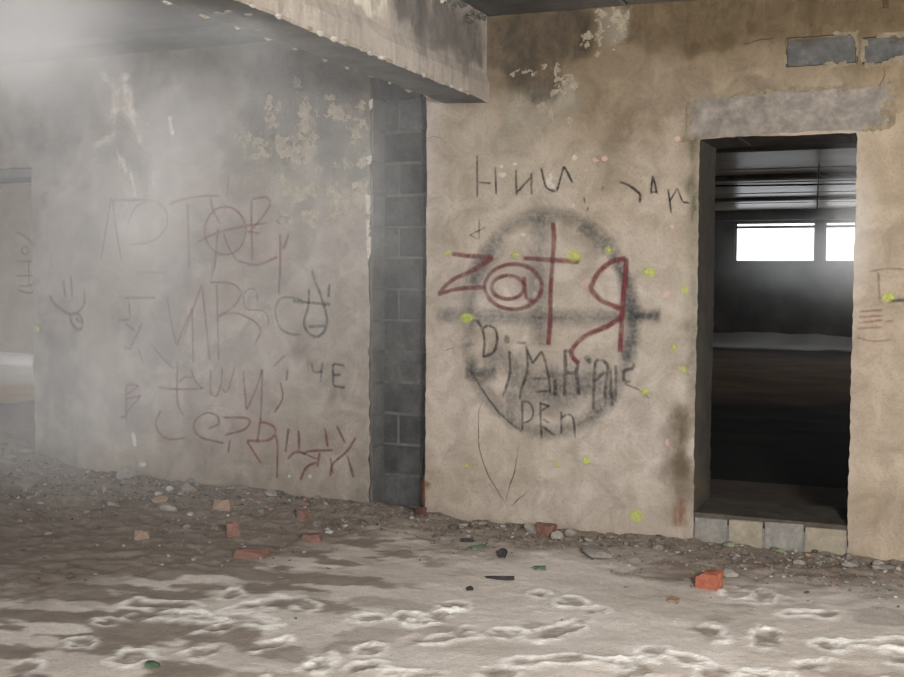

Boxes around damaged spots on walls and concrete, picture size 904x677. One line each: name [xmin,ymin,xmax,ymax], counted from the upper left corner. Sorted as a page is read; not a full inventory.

flaking render [580,6,630,57]
flaking render [510,62,578,120]